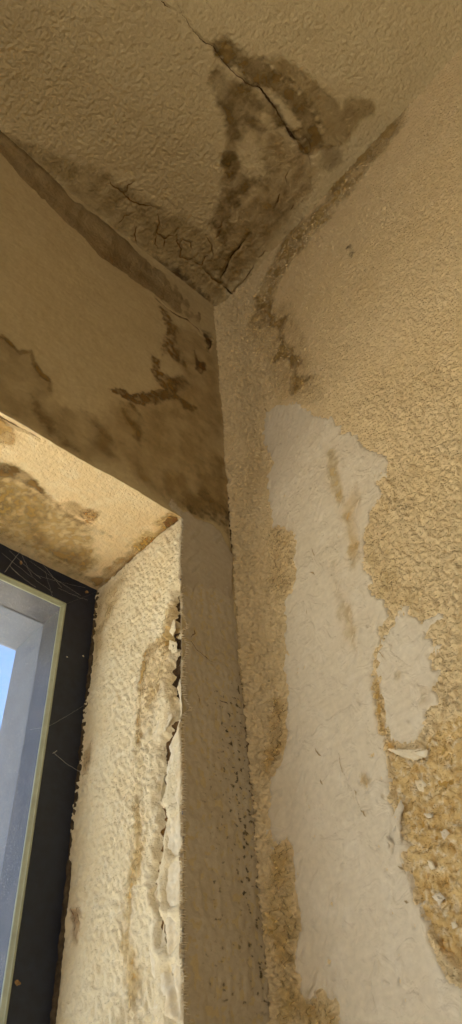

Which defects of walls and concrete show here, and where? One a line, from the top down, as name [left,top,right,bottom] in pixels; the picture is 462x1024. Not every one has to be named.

crack [161,1,311,209]
damp [213,39,328,162]
crack [109,180,265,294]
damp [139,153,287,300]
damp [251,119,398,394]
damp [111,307,206,439]
flaking render [149,519,193,1024]
flaking render [384,716,462,967]